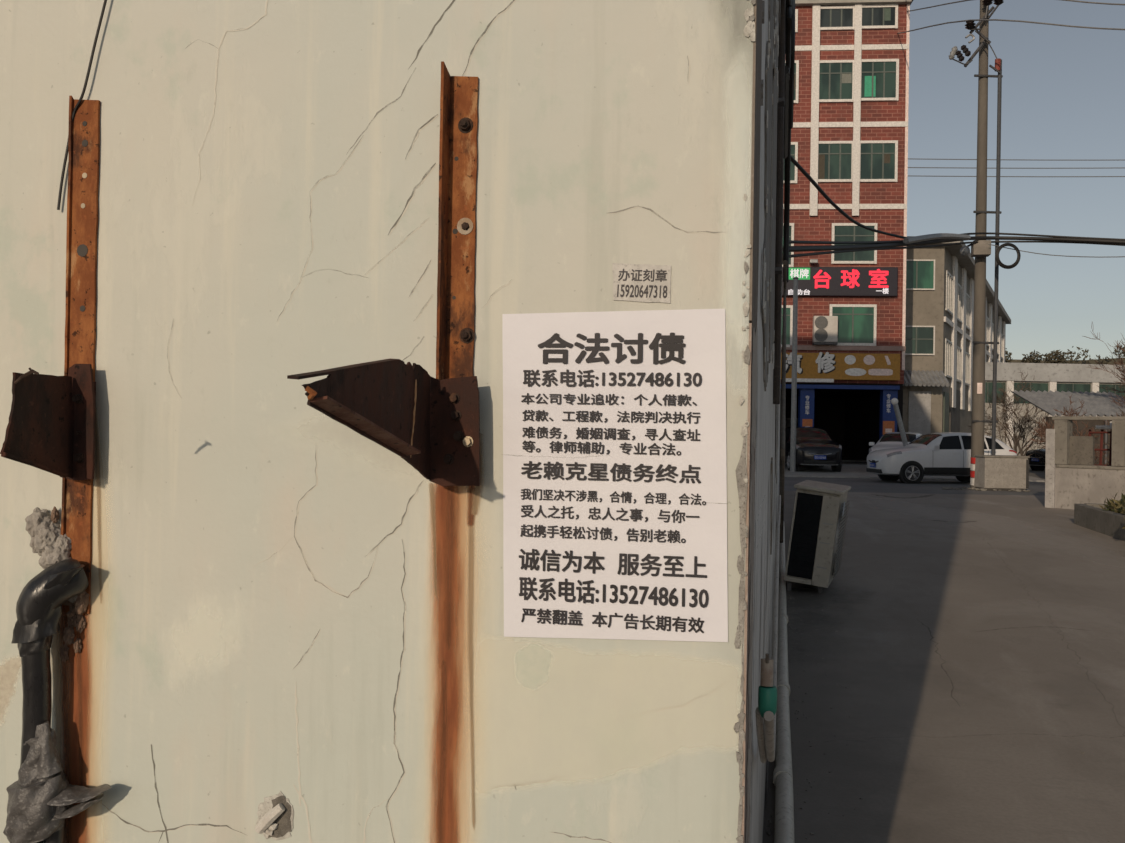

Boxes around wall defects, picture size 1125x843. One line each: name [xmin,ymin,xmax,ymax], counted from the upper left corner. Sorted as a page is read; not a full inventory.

crack [278,0,455,322]
crack [462,0,516,76]
crack [607,206,731,234]
peeling [733,0,784,843]
corrosion [52,408,102,788]
corrosion [65,803,94,843]
crack [99,744,248,843]
spalling [255,791,294,840]
crack [254,452,424,843]
corrosion [429,434,482,843]